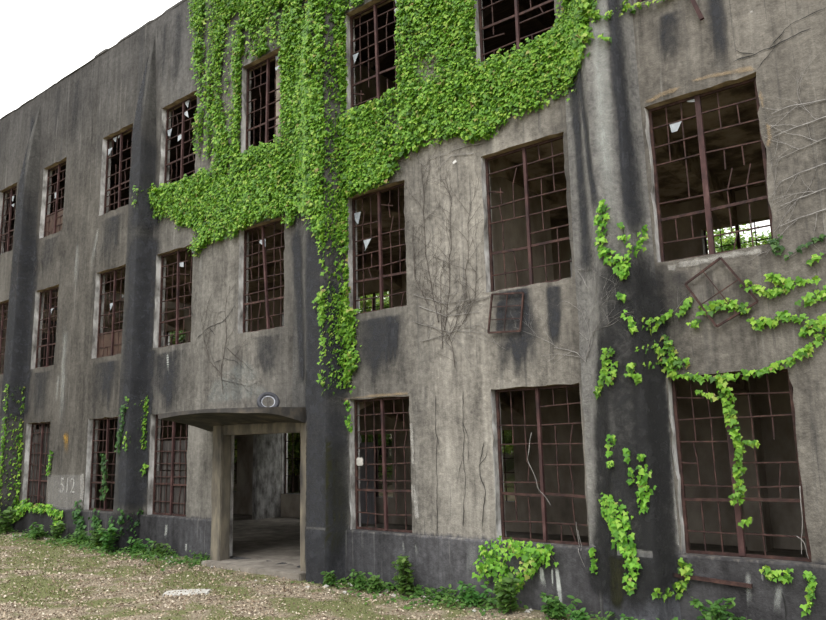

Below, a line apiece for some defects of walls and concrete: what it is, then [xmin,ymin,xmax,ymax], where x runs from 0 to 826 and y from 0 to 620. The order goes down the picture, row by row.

leakage [660,13,677,51]
leakage [709,0,726,53]
leakage [608,0,645,230]
leakage [570,67,597,265]
leakage [497,288,535,370]
leakage [546,286,561,341]
leakage [589,256,678,607]